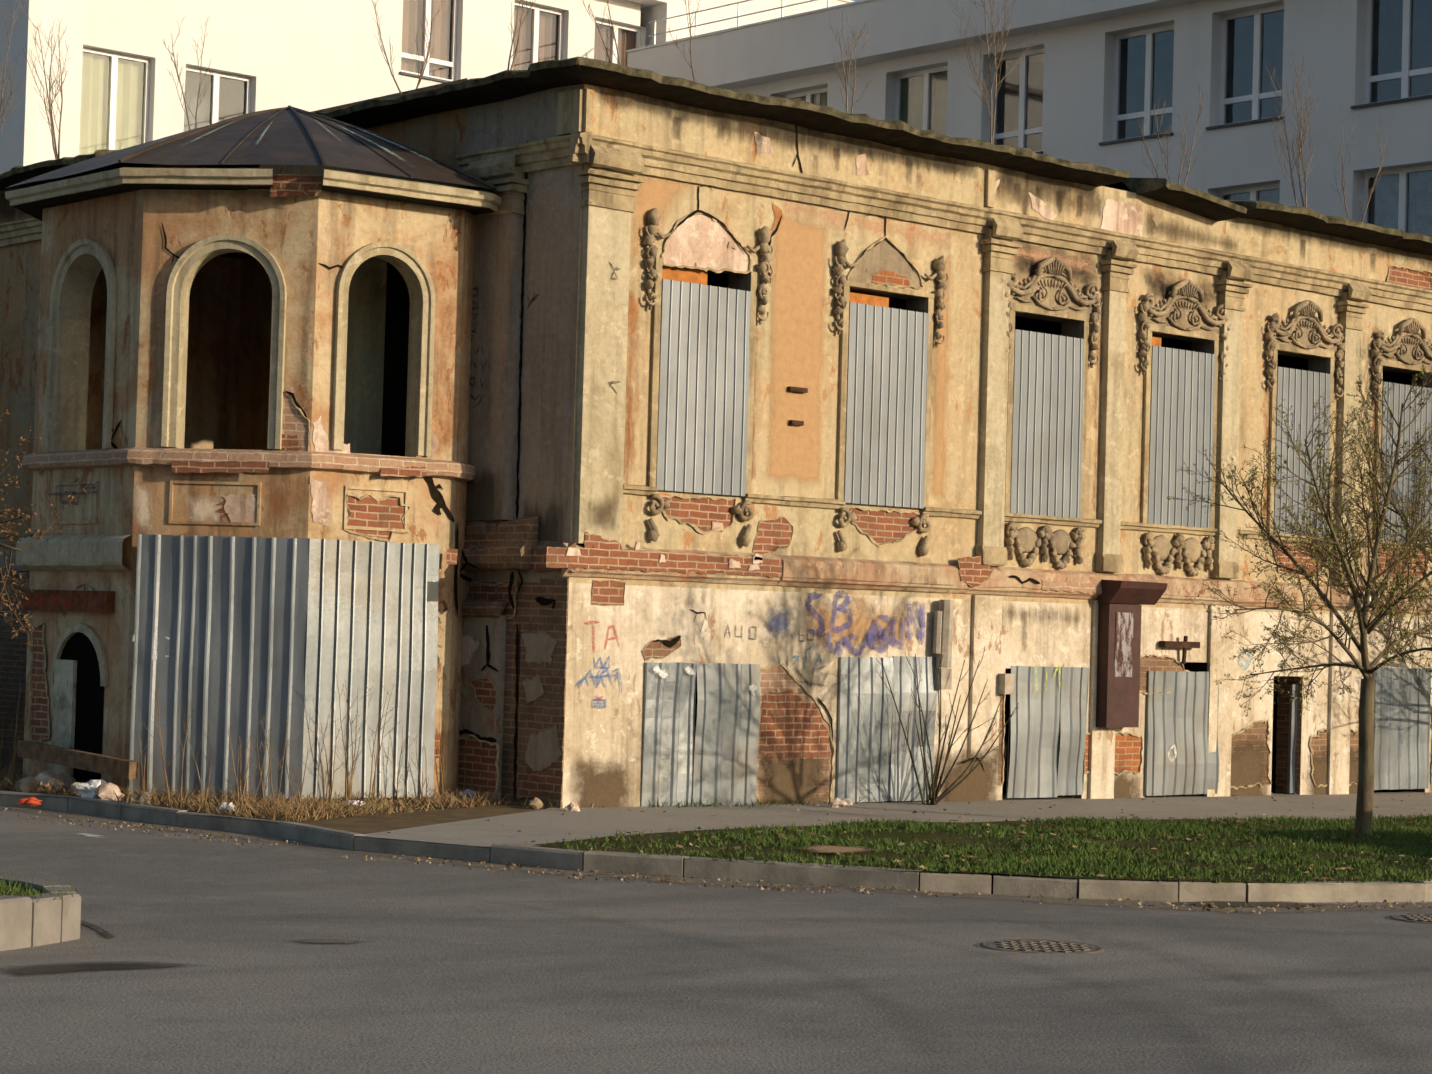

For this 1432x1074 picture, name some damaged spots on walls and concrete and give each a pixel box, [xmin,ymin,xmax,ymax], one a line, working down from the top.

flaking render [1386,265,1432,290]
flaking render [171,388,351,473]
flaking render [310,476,411,542]
flaking render [656,494,737,535]
flaking render [848,506,920,547]
flaking render [529,516,793,606]
flaking render [642,634,682,661]
flaking render [467,581,567,799]
damp [576,761,628,808]
flaking render [756,663,835,805]
flaking render [1114,731,1143,775]
damp [1230,742,1267,796]